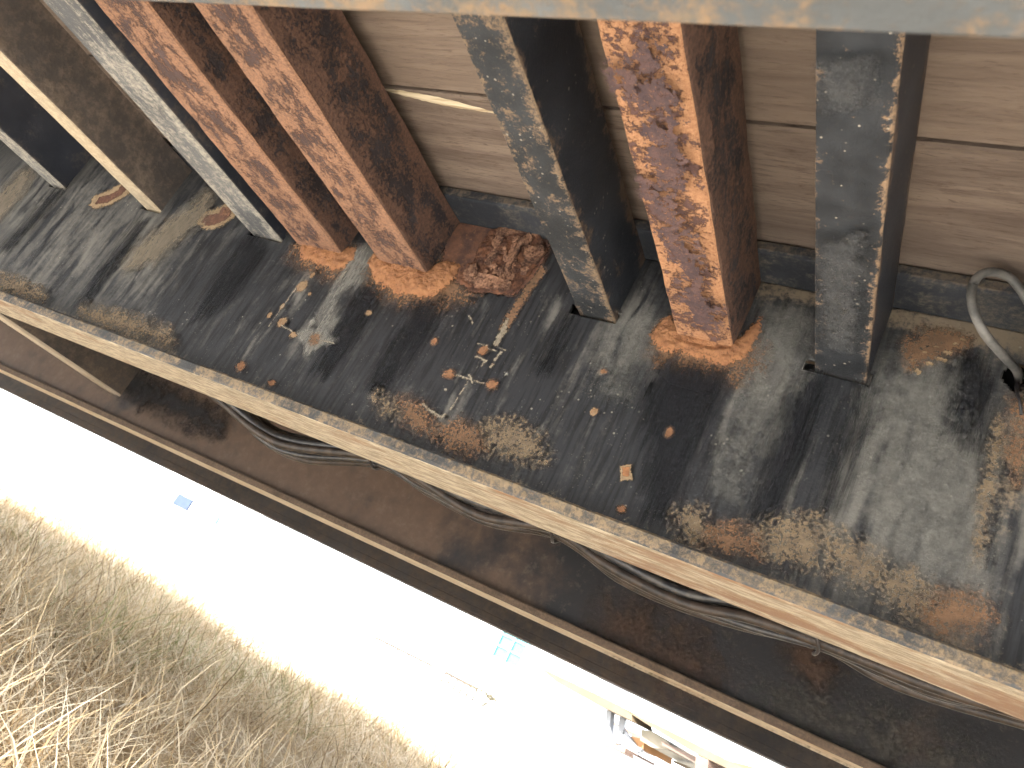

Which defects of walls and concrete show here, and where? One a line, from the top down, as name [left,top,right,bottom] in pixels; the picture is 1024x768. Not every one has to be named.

leakage [1,188,63,250]
leakage [73,220,146,312]
leakage [296,245,377,378]
leakage [369,297,442,392]
corrosion [285,223,551,356]
corrosion [393,393,489,462]
leakage [642,360,725,519]
leakage [753,370,821,519]
leakage [821,378,876,519]
leakage [947,350,989,454]
corrosion [694,518,766,566]
corrosion [913,584,1001,649]